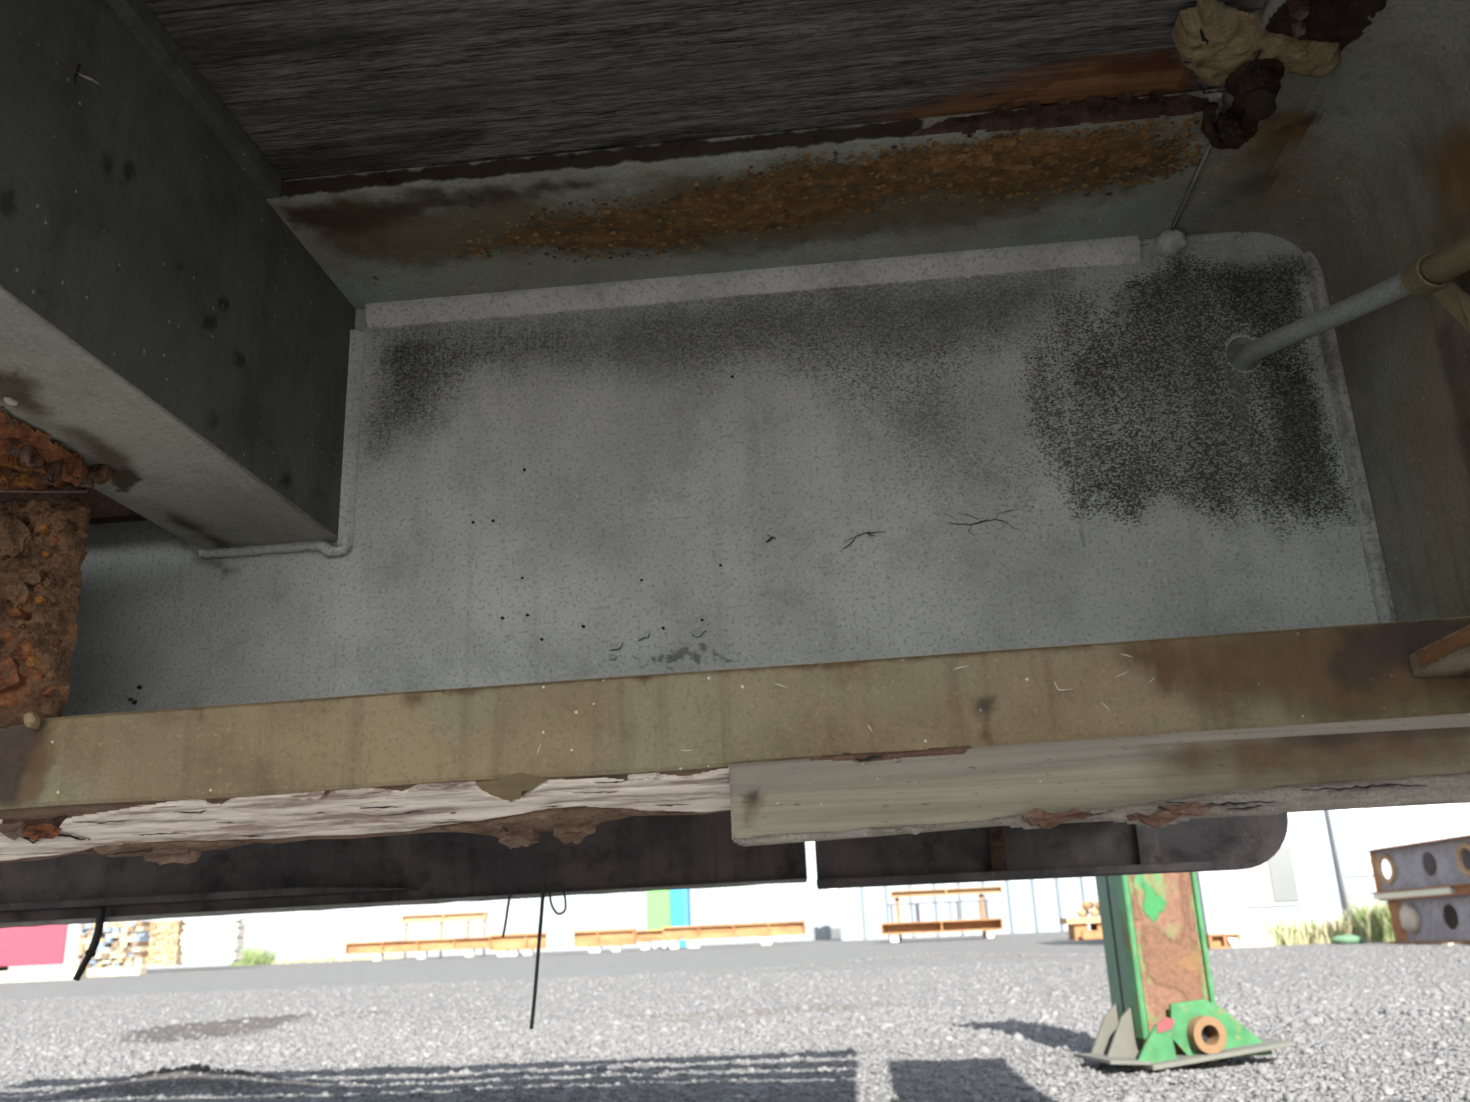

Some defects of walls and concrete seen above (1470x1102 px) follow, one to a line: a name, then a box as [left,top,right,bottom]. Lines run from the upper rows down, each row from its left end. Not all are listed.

rust [290,102,1240,280]
peeling [0,397,88,494]
damp [367,247,1357,541]
peeling [0,767,731,865]